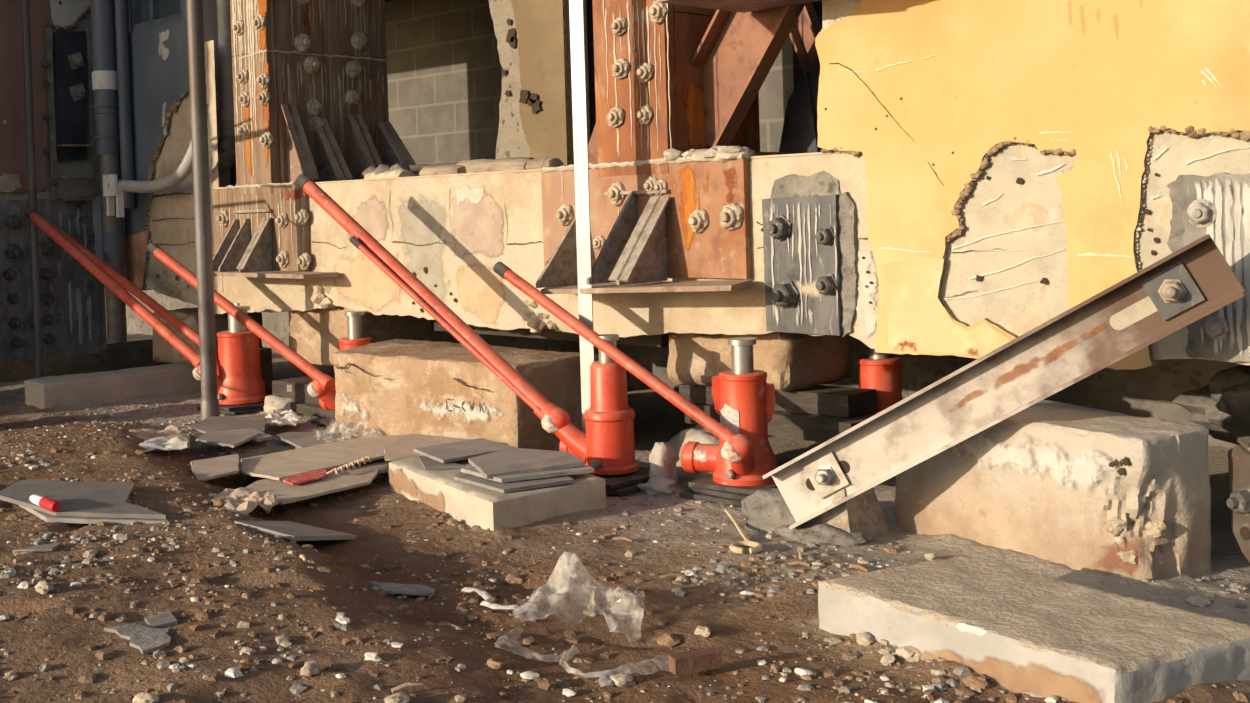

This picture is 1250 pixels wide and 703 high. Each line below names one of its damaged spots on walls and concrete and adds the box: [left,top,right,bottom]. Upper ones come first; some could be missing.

spalling [145,88,198,299]
spalling [204,40,219,241]
corrosion [244,0,269,174]
peeling [311,255,423,313]
peeling [348,186,505,324]
corrosion [682,82,711,149]
corrosion [678,166,737,250]
corrosion [732,122,746,147]
leakage [770,204,838,325]
spalling [938,137,1076,334]
spalling [1135,125,1250,271]
leakage [1195,178,1250,355]